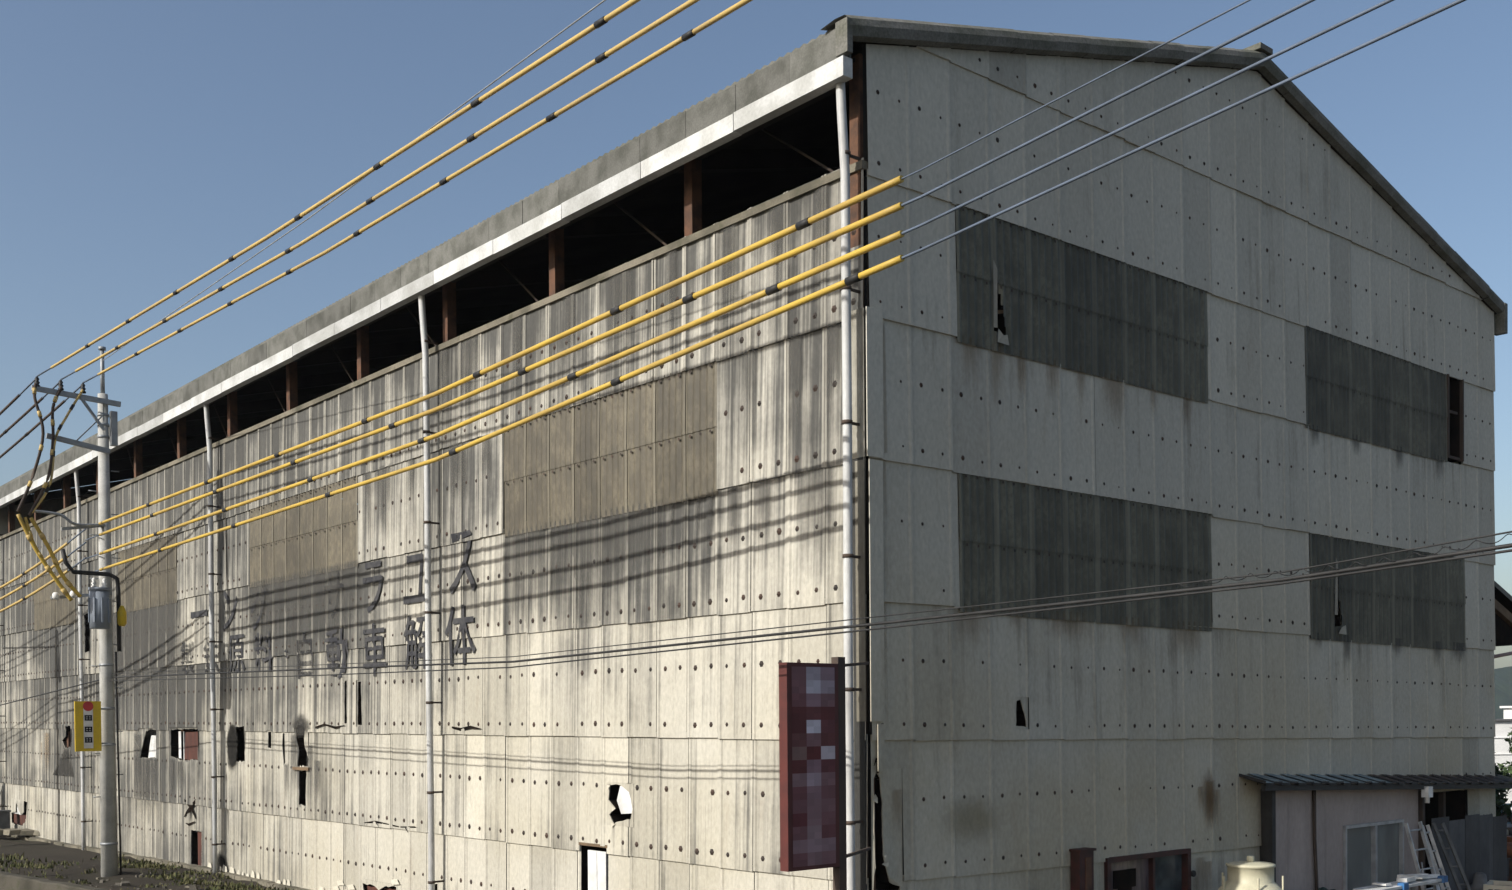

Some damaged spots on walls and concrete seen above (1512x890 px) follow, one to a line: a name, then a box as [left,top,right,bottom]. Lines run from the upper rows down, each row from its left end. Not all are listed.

peeling [993,260,1009,345]
leakage [113,602,175,673]
leakage [53,749,73,777]
spalling [267,722,309,807]
leakage [285,735,318,785]
peeling [190,829,290,886]
spalling [319,879,399,890]
spalling [871,768,903,890]